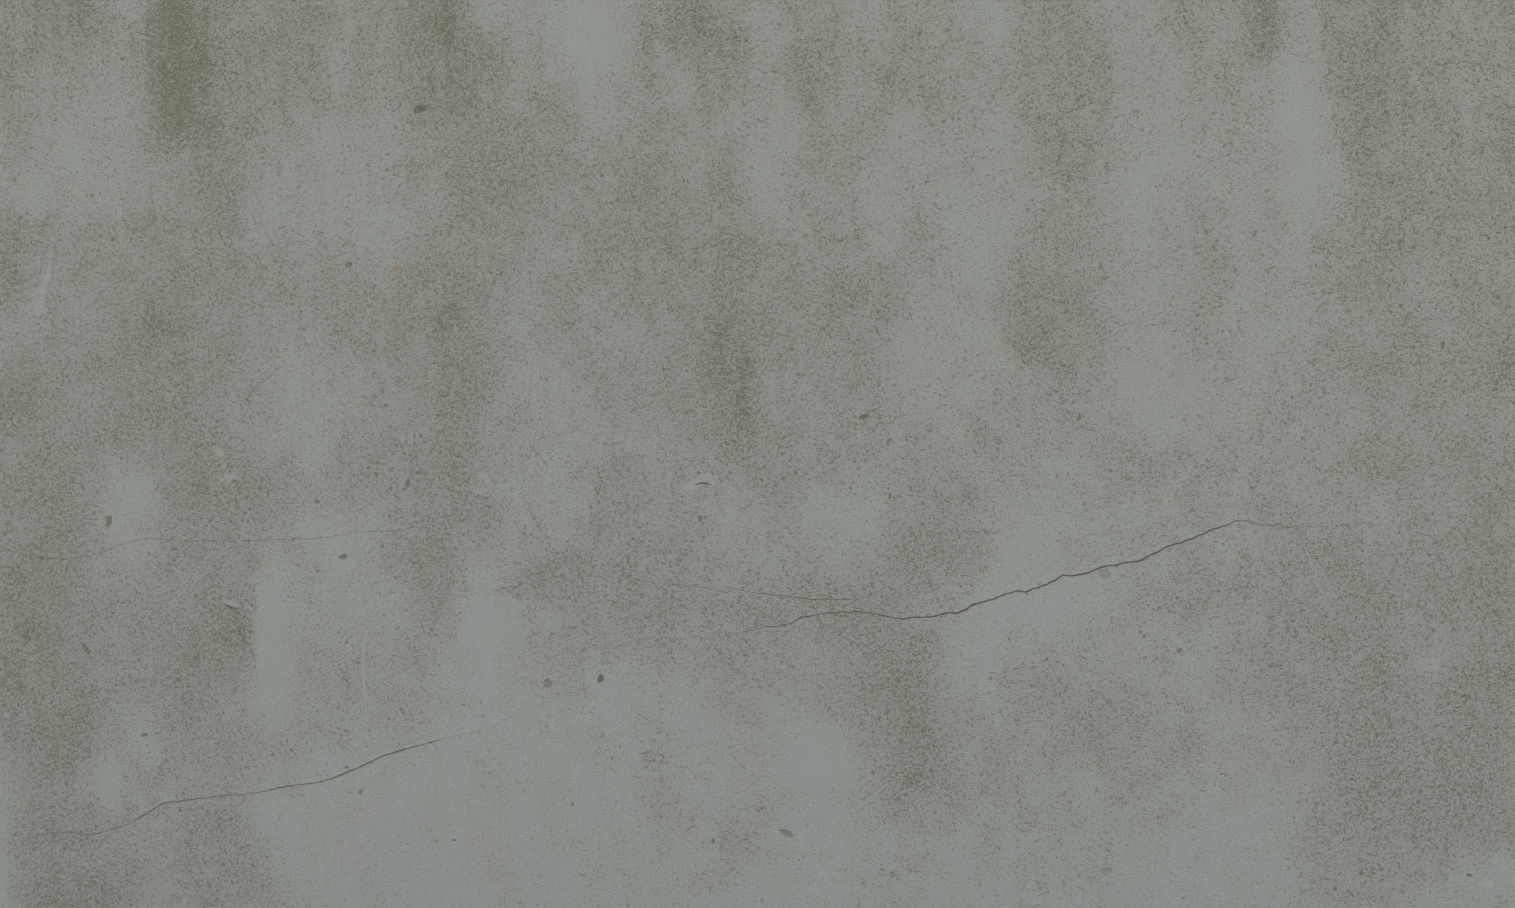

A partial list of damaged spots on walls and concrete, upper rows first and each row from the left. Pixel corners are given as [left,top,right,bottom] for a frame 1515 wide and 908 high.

crack [0,501,1438,648]
crack [0,710,520,851]